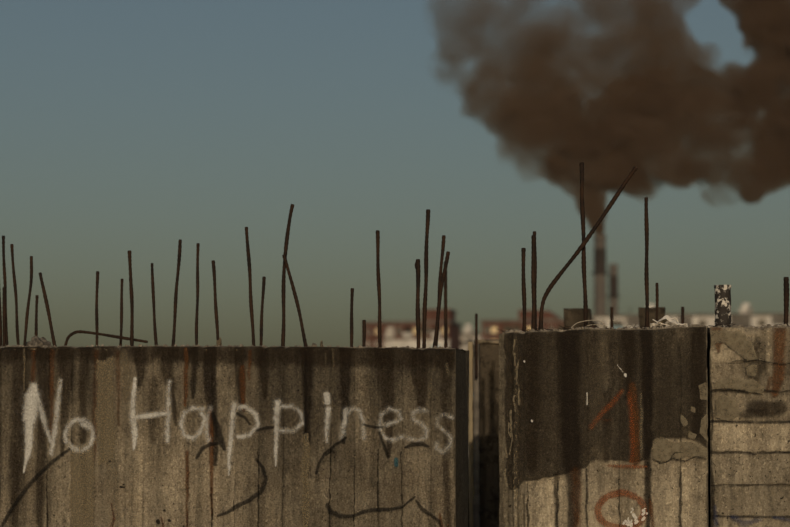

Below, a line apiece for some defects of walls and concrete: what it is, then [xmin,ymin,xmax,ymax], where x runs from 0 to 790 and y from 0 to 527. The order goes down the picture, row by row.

water stain [0,347,455,527]
water stain [504,327,707,527]
peeling [652,407,708,461]
peeling [699,383,707,400]